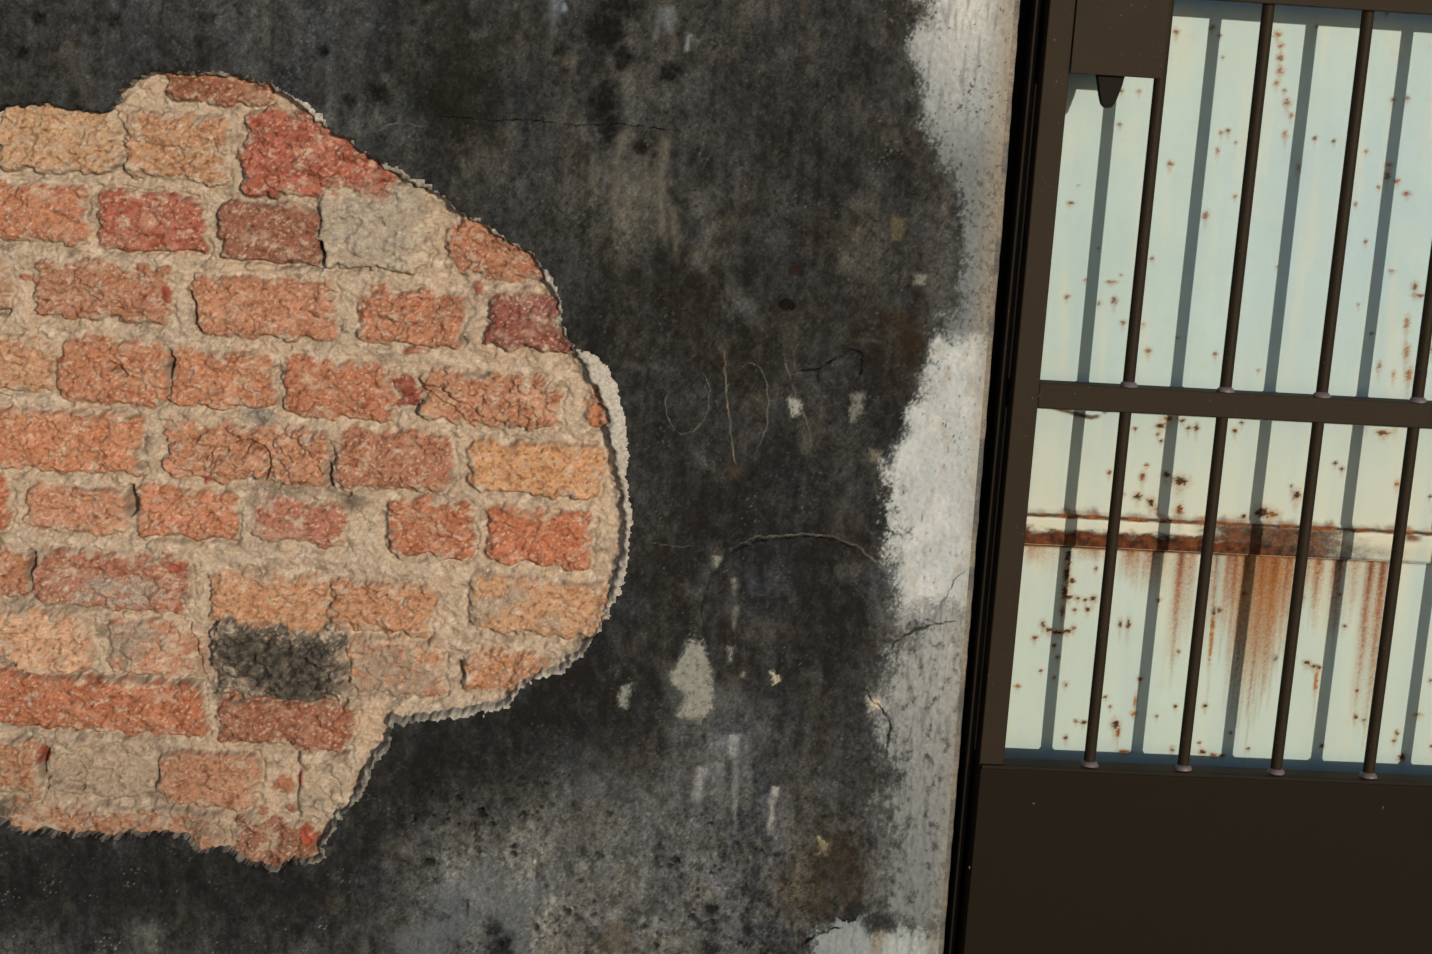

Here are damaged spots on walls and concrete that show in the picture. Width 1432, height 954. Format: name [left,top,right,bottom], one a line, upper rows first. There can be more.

damp [589,0,678,242]
flaking render [0,70,633,872]
crack [733,533,880,567]
corrosion [1024,463,1432,681]
corrosion [1103,677,1142,753]
damp [728,735,739,755]
damp [695,767,707,799]
damp [768,786,779,830]
damp [847,902,892,932]